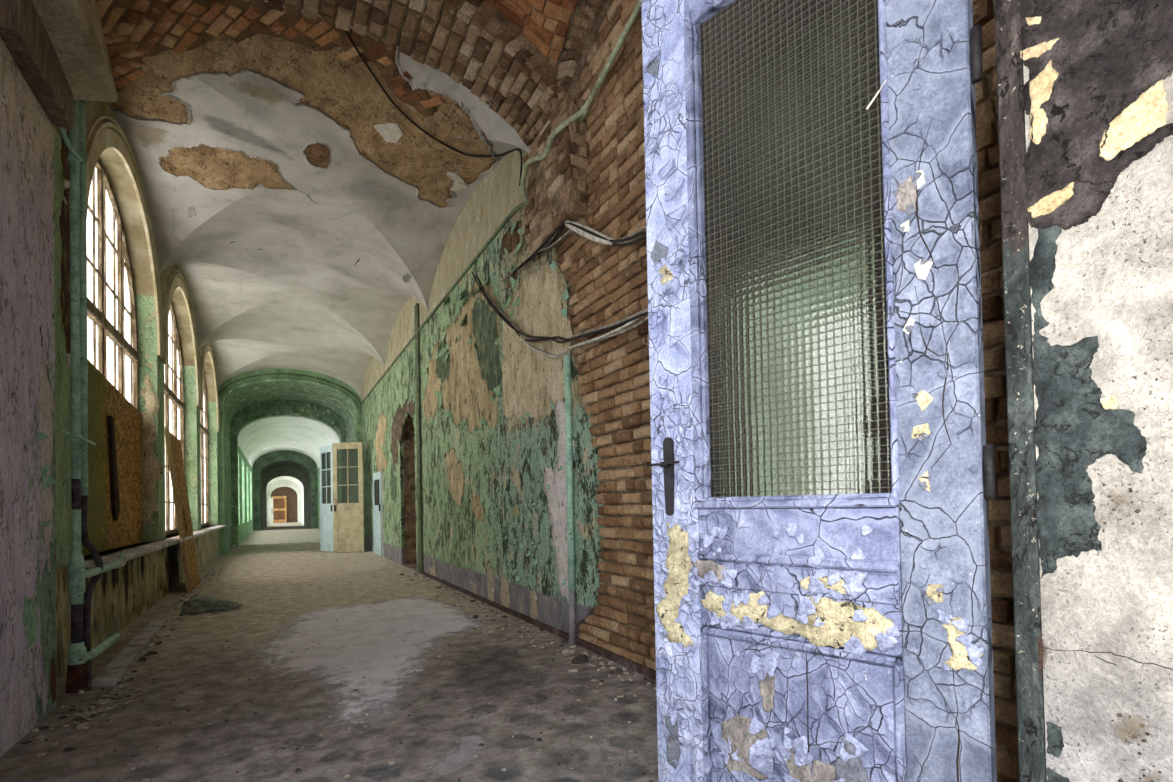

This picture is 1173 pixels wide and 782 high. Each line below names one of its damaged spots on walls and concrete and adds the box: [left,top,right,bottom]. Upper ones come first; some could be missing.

spalling [96,0,501,209]
flaking render [374,0,694,670]
spalling [914,258,933,280]
crack [915,118,952,482]
flaking render [925,0,1019,782]
peeling [1013,0,1173,579]
peeling [691,526,781,630]
spalling [661,709,681,769]
peeling [711,650,869,782]
crack [946,702,960,782]
peeling [1046,722,1070,782]
crack [1048,648,1173,670]